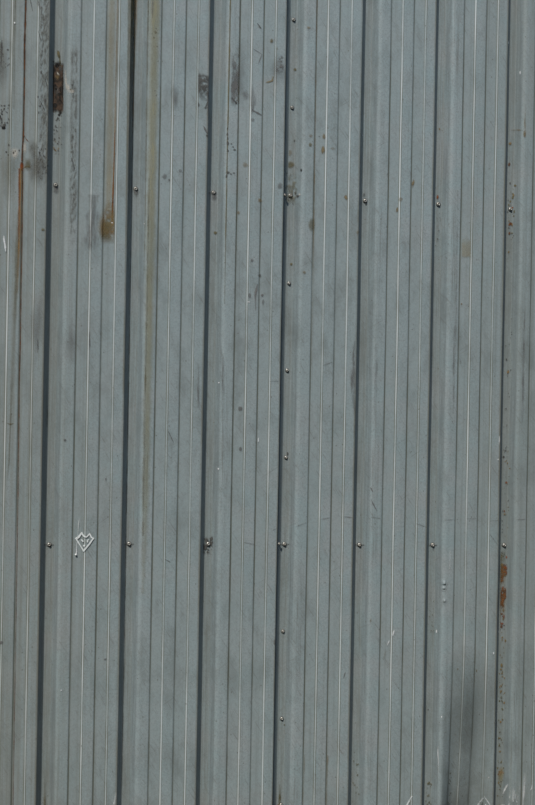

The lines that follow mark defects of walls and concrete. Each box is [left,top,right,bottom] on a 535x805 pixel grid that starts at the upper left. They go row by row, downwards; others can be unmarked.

corrosion [18,114,30,284]
corrosion [103,130,115,237]